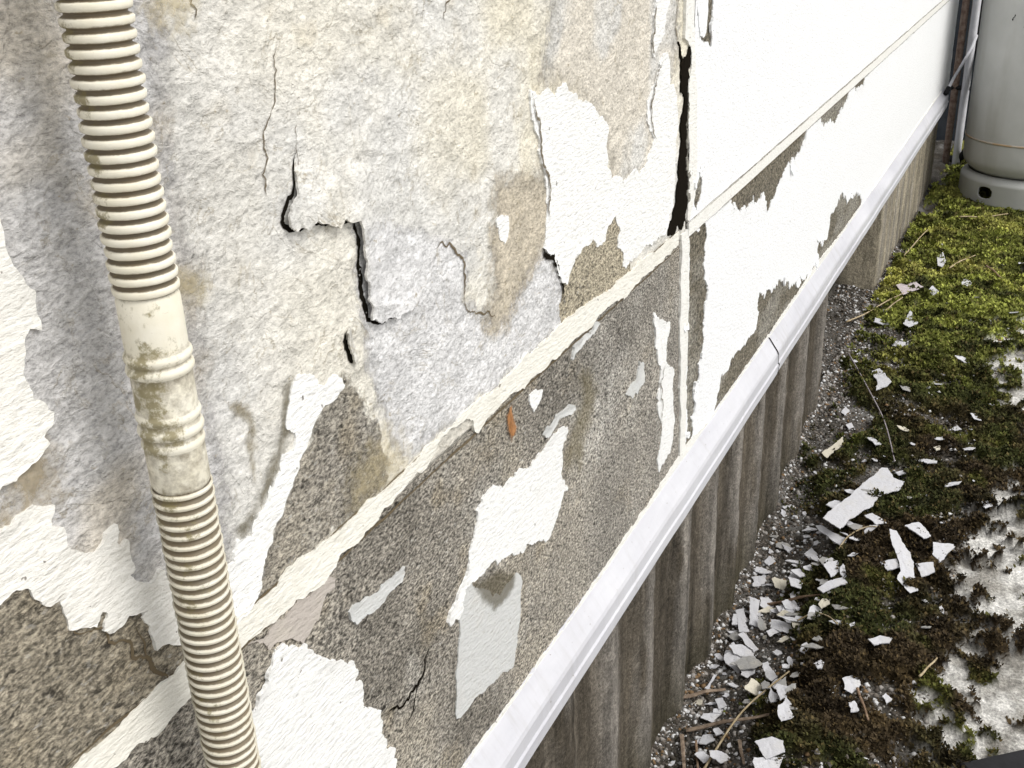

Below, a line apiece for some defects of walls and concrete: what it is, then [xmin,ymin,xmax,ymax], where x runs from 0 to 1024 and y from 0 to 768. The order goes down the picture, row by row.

peeling [0,0,168,582]
peeling [128,0,231,560]
crack [262,46,495,364]
peeling [538,0,680,181]
crack [651,0,692,236]
peeling [722,131,806,211]
peeling [714,192,861,411]
peeling [820,79,864,127]
peeling [241,169,707,768]
corrosion [507,407,516,436]
peeling [115,697,205,768]
crack [388,650,429,723]